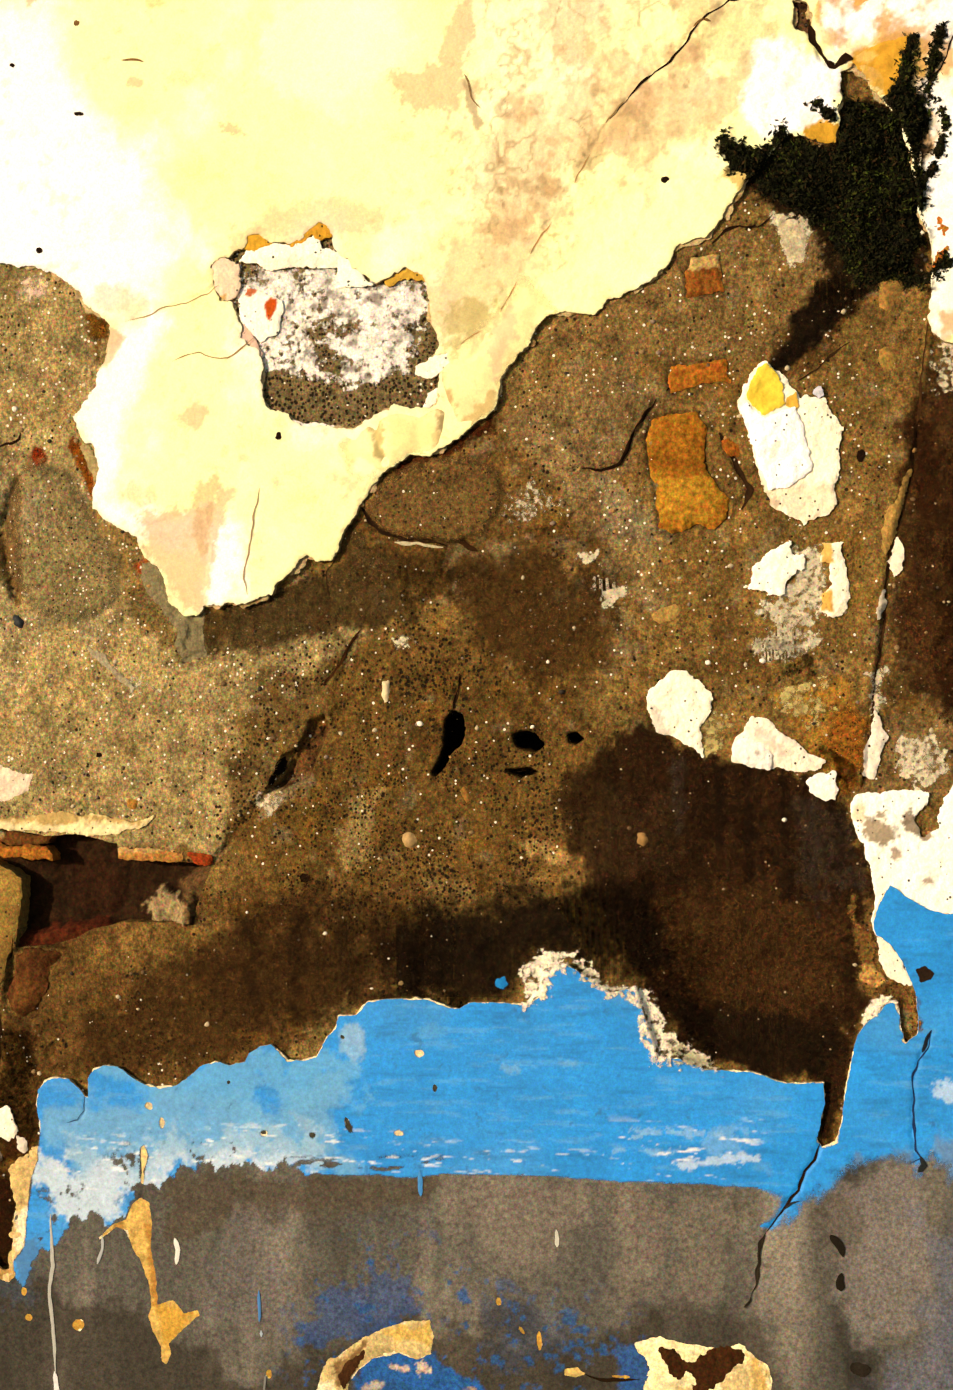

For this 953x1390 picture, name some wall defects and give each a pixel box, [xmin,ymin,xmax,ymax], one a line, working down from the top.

crack [606,0,737,122]
crack [808,25,853,69]
crack [460,284,516,345]
crack [530,222,552,254]
leakage [718,136,878,374]
leakage [904,134,934,293]
spalling [0,185,953,1184]
leakage [81,710,875,1146]
crack [910,1030,932,1172]
crack [744,1144,820,1308]
crack [830,1235,845,1291]